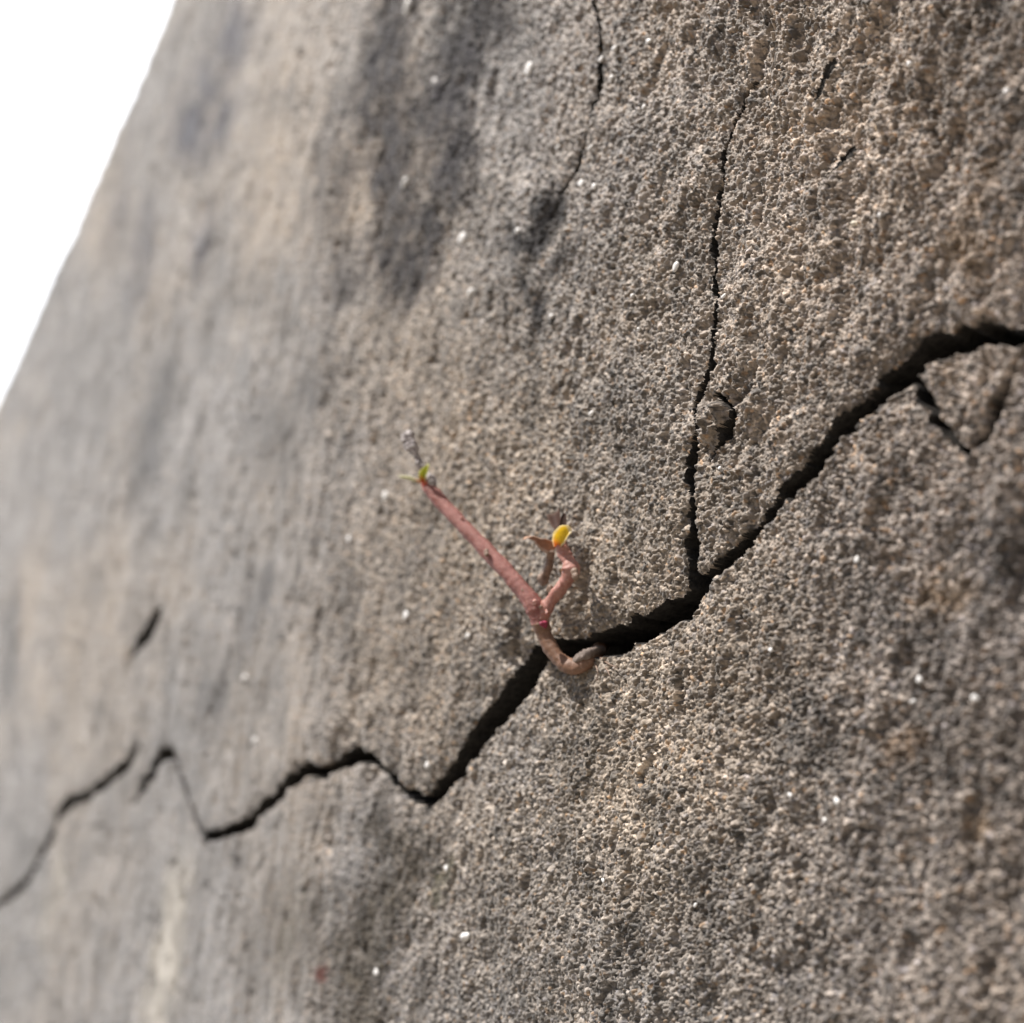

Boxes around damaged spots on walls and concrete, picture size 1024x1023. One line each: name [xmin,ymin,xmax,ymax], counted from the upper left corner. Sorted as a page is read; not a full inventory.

crack [561,0,605,191]
crack [131,81,1024,844]
crack [0,743,140,906]